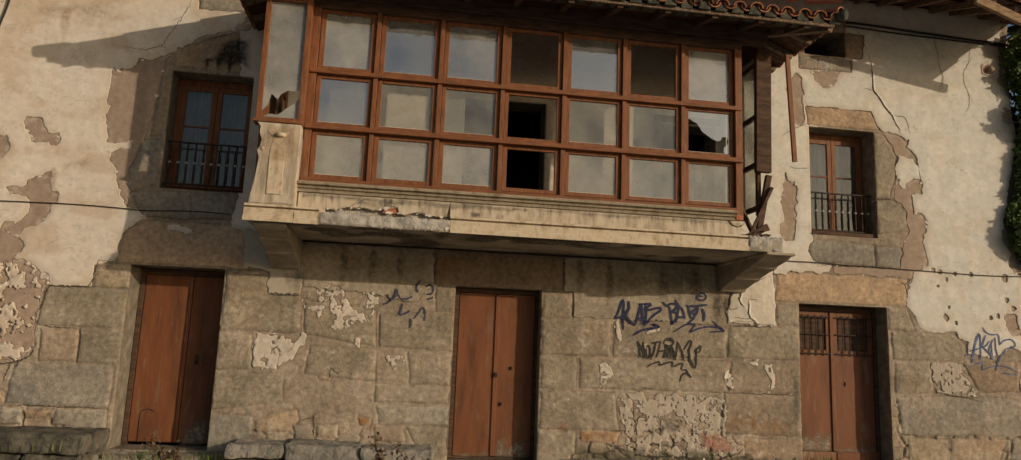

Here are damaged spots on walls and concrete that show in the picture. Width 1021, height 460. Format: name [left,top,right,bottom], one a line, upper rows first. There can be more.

peeling [0,135,10,158]
peeling [24,117,61,146]
peeling [106,17,252,207]
peeling [786,70,840,126]
crack [856,29,910,134]
peeling [885,132,918,165]
crack [933,29,973,115]
peeling [0,171,59,263]
peeling [718,173,797,267]
peeling [832,175,956,287]